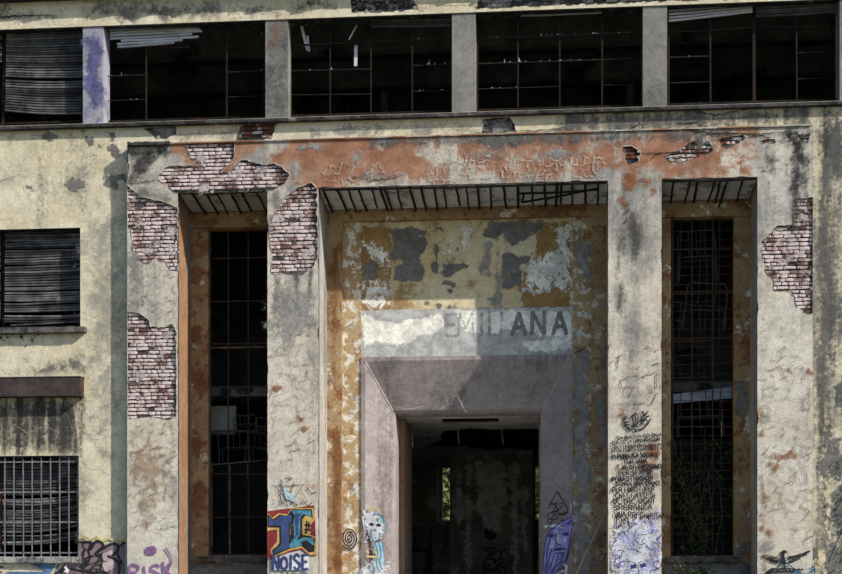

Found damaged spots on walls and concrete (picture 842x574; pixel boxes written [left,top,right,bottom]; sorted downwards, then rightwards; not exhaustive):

flaking render [103,174,179,421]
flaking render [158,123,290,195]
flaking render [268,182,319,275]
water stain [311,125,446,149]
flaking render [361,219,591,357]
corrosion [618,173,657,206]
water stain [457,107,842,459]
flaking render [664,134,747,162]
corrosion [663,178,756,207]
flaking render [761,197,813,315]
water stain [0,398,85,457]
corrosion [333,433,343,569]